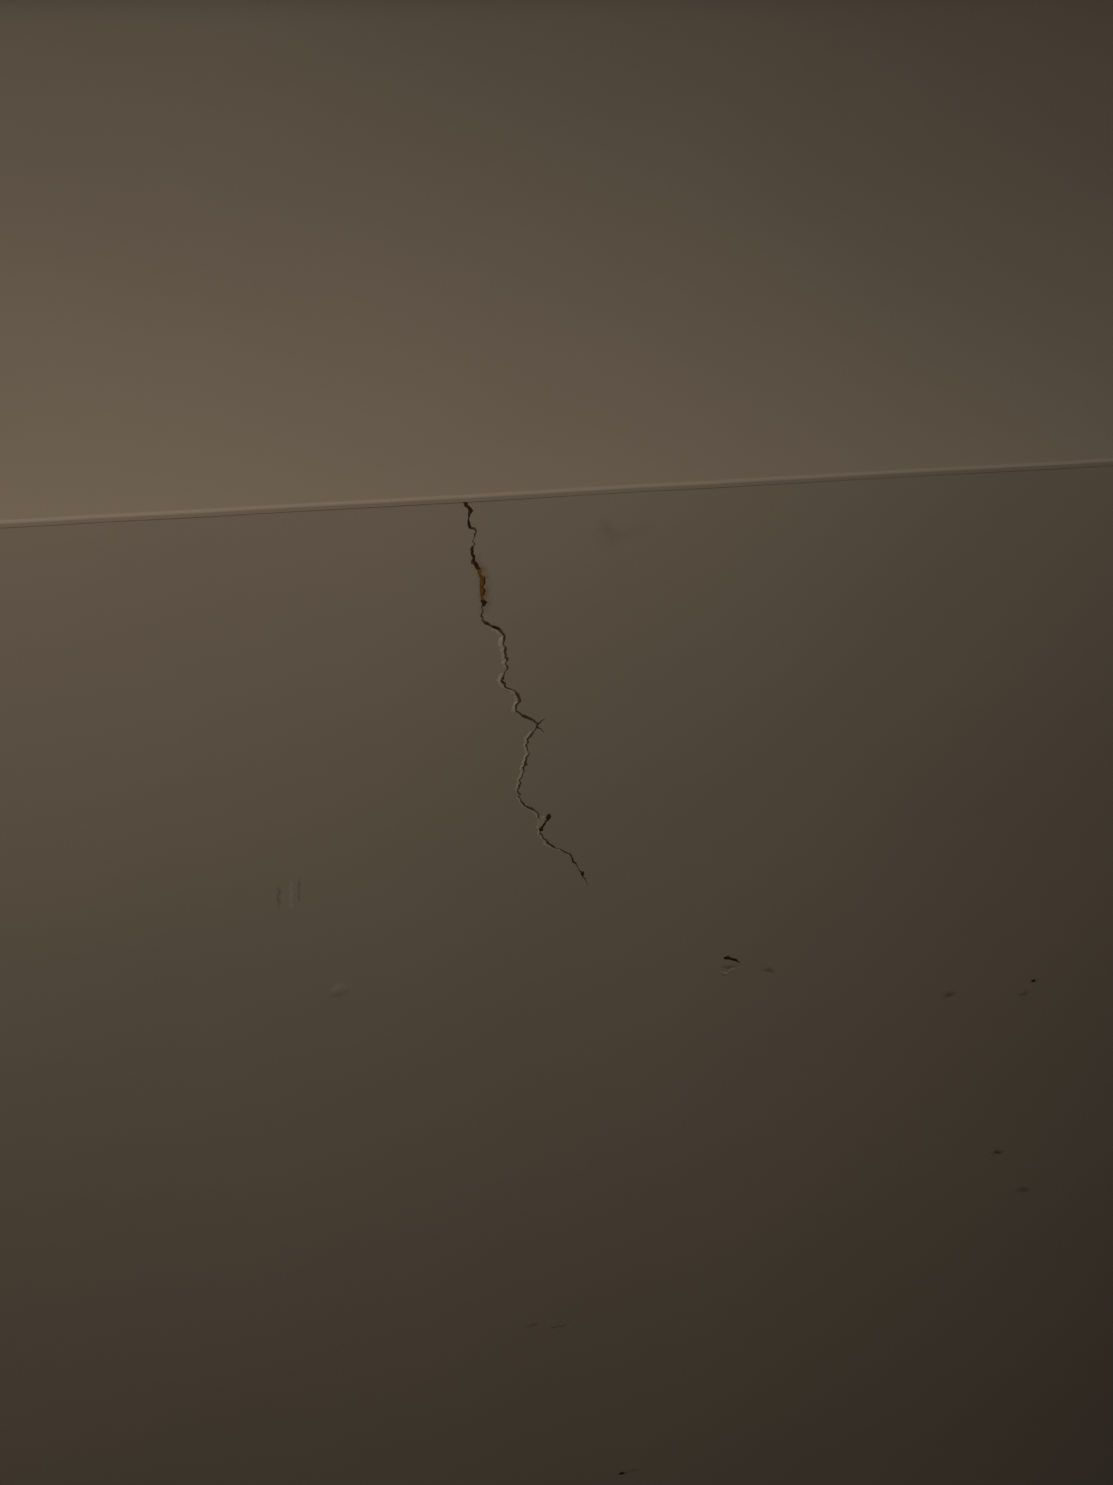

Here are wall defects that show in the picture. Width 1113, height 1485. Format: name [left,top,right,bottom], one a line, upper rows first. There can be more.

crack [463,502,587,883]